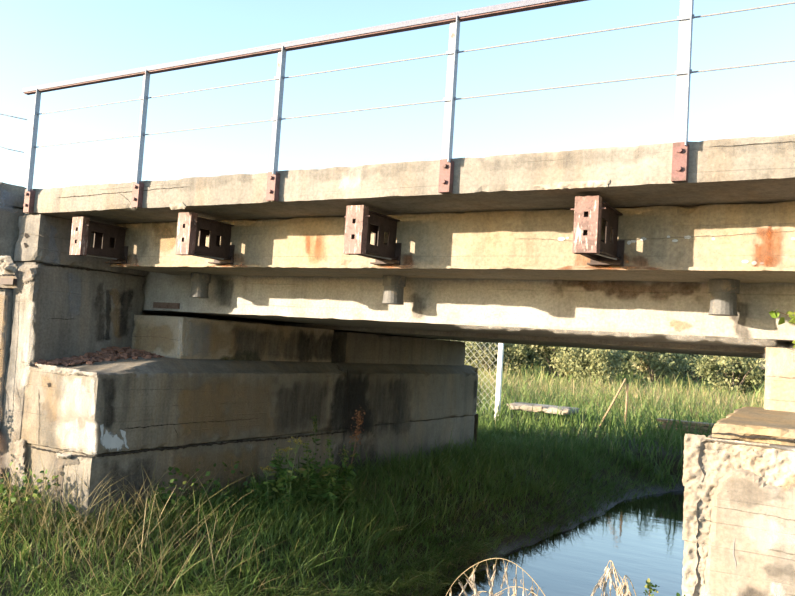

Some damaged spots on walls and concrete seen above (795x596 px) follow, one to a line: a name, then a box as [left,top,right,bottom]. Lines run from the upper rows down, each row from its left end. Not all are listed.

corrosion [756,226,780,266]
corrosion [572,281,697,298]
damp [97,287,208,356]
crack [27,409,347,457]
spalling [682,434,795,596]